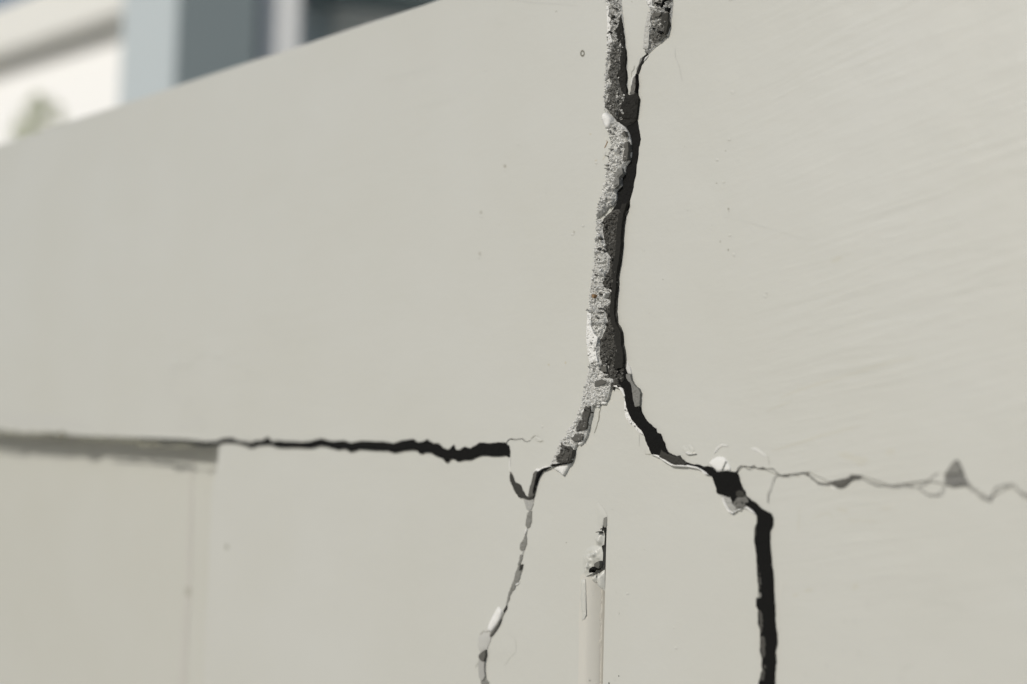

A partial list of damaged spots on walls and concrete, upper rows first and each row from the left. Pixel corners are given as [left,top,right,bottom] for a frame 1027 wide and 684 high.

crack [0,429,162,447]
crack [189,435,551,684]
spalling [533,0,731,476]
crack [610,15,831,684]
crack [860,473,1027,501]